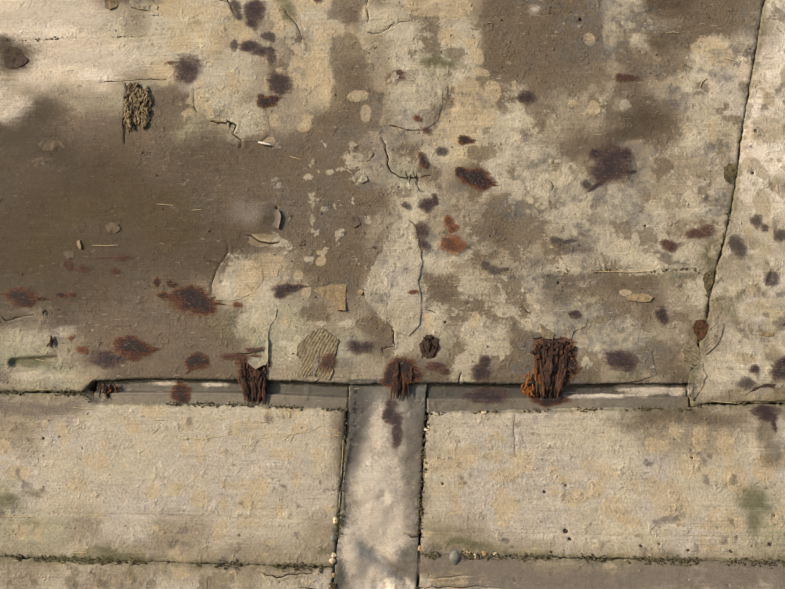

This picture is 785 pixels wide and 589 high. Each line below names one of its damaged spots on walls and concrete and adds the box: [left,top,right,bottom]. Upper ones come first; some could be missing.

water stain [0,99,65,154]
crack [194,90,248,150]
rust [418,193,438,212]
rust [454,167,499,190]
rust [414,215,467,255]
rust [152,278,242,315]
rust [68,335,161,368]
rust [220,347,271,405]
spalling [296,328,339,382]
crack [382,329,399,356]
rust [380,335,450,449]
rust [520,336,580,406]